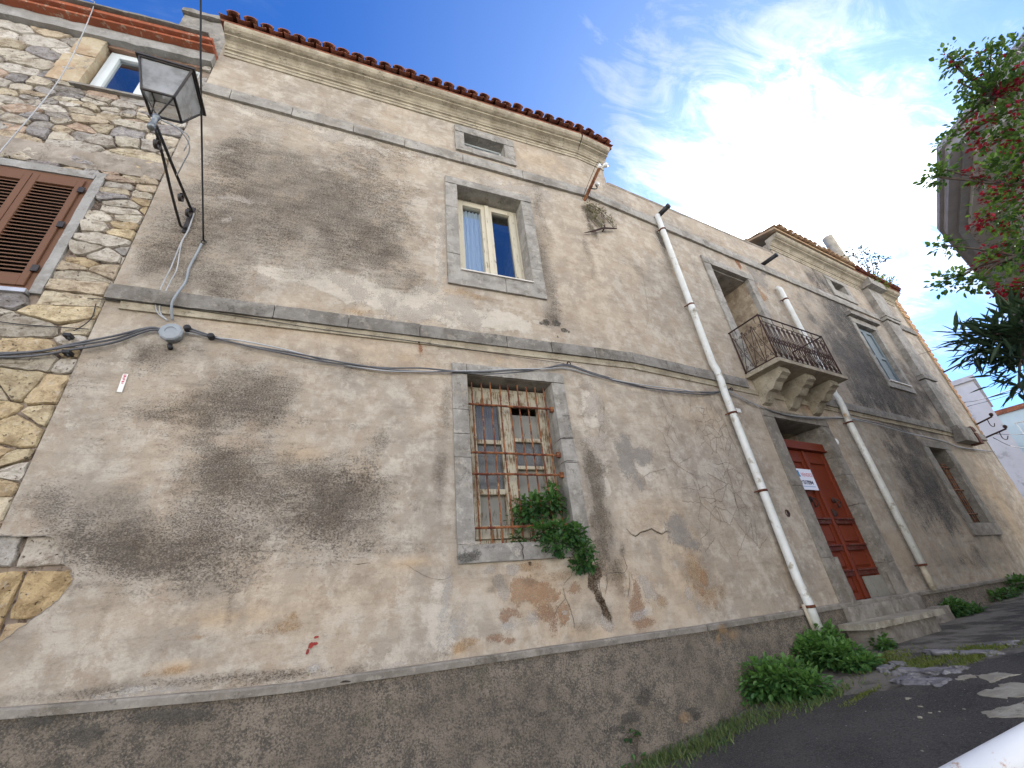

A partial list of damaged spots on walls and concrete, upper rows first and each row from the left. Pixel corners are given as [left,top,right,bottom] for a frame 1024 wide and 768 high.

flaking render [456,549,580,651]
leakage [587,454,622,621]
crack [645,400,768,557]